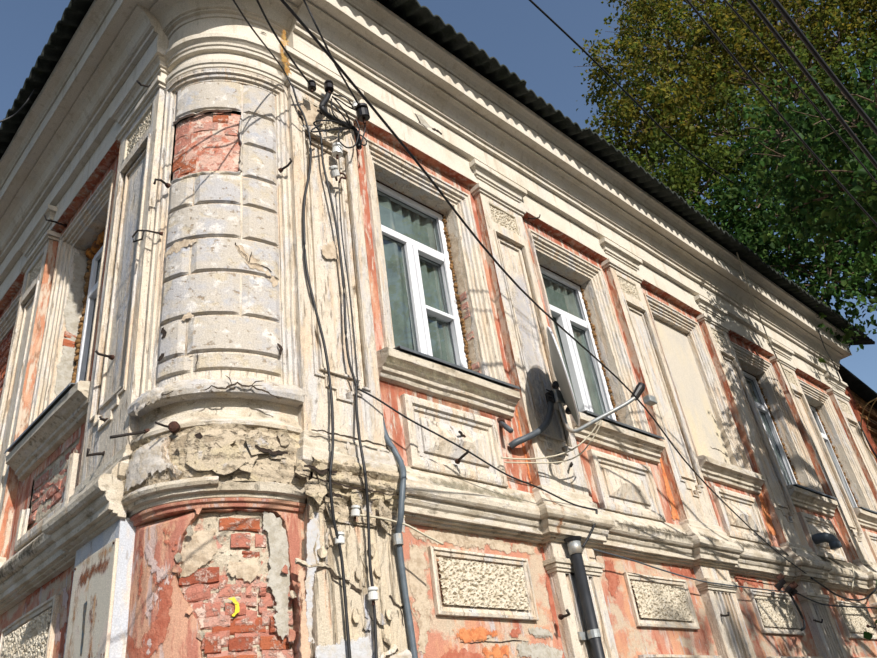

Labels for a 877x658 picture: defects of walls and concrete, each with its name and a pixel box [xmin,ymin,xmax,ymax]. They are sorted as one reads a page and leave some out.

flaking render [171,109,244,184]
crack [205,375,278,398]
flaking render [27,437,80,531]
flaking render [125,428,564,658]